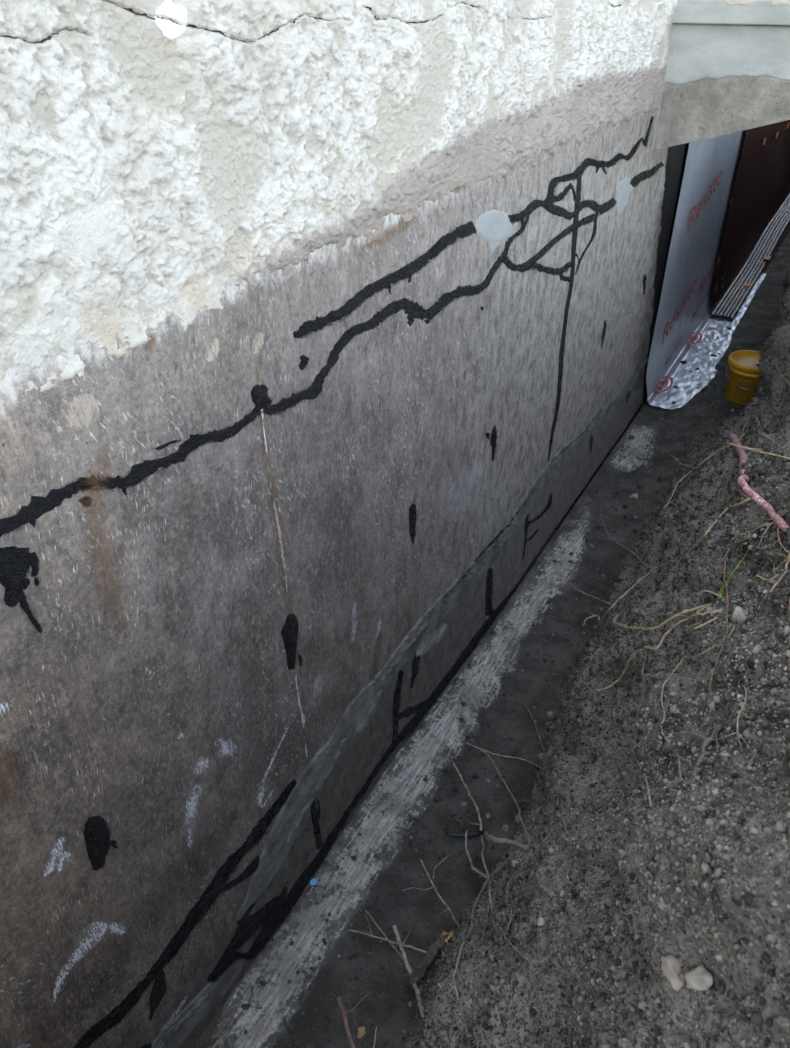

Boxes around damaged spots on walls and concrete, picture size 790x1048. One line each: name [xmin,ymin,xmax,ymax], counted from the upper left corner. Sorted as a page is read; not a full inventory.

crack [0,28,92,44]
crack [105,0,477,43]
crack [0,116,664,538]
crack [522,493,552,559]
crack [485,568,494,616]
crack [73,779,323,1048]